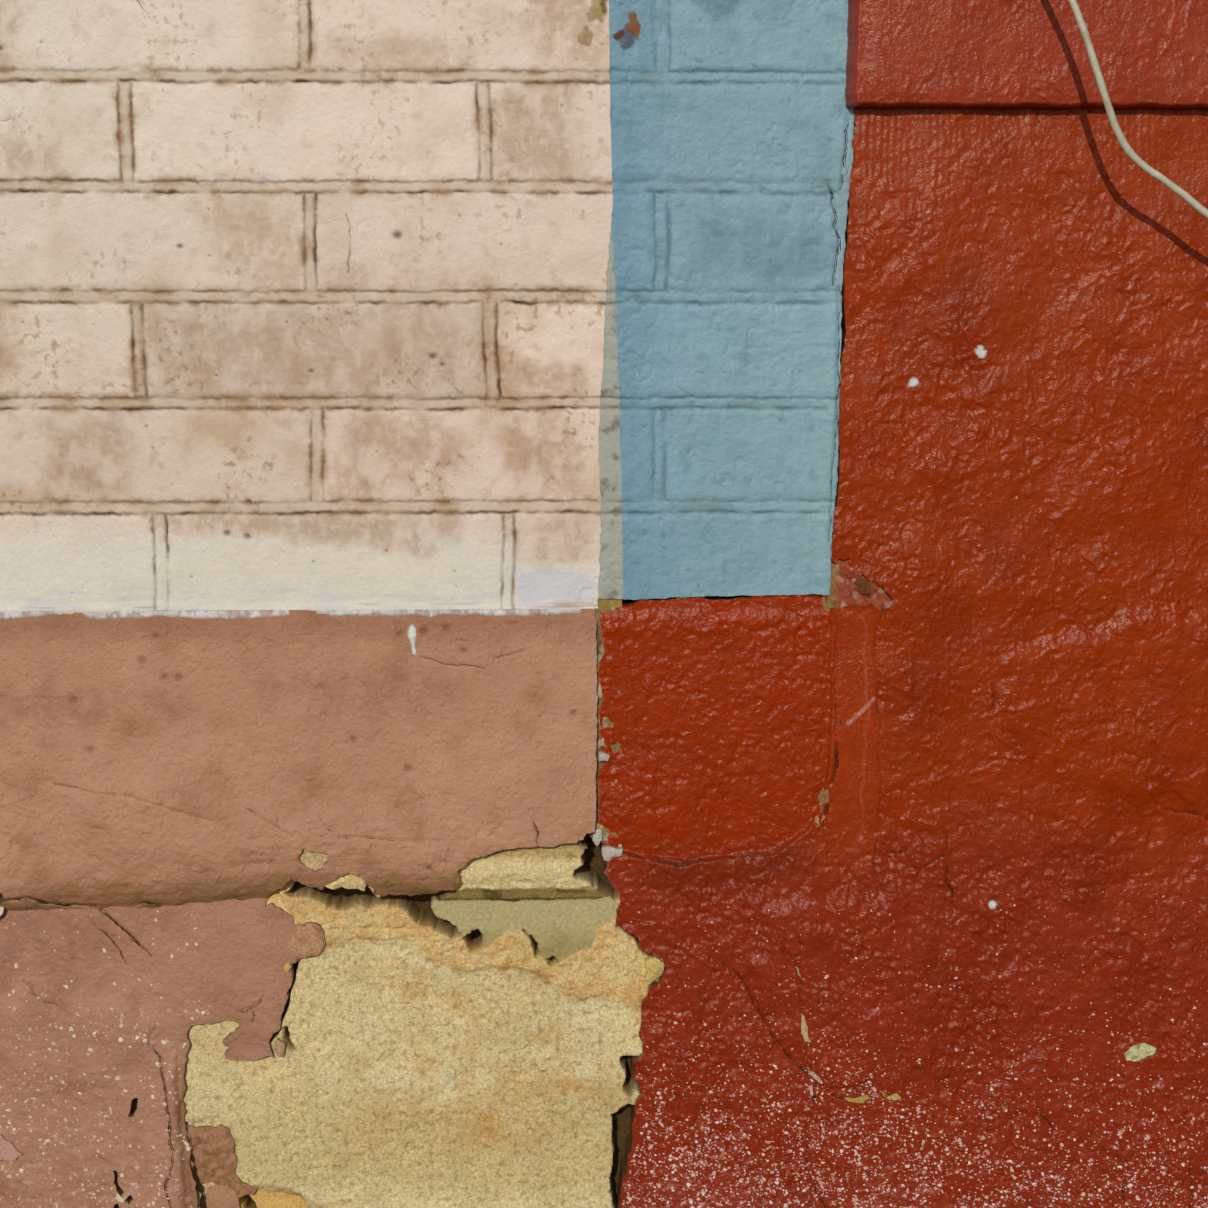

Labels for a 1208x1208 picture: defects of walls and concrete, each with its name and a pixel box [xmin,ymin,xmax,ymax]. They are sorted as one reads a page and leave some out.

peeling [578,0,606,45]
peeling [613,13,640,50]
spalling [822,558,893,612]
crack [623,846,788,867]
spalling [183,822,665,1208]